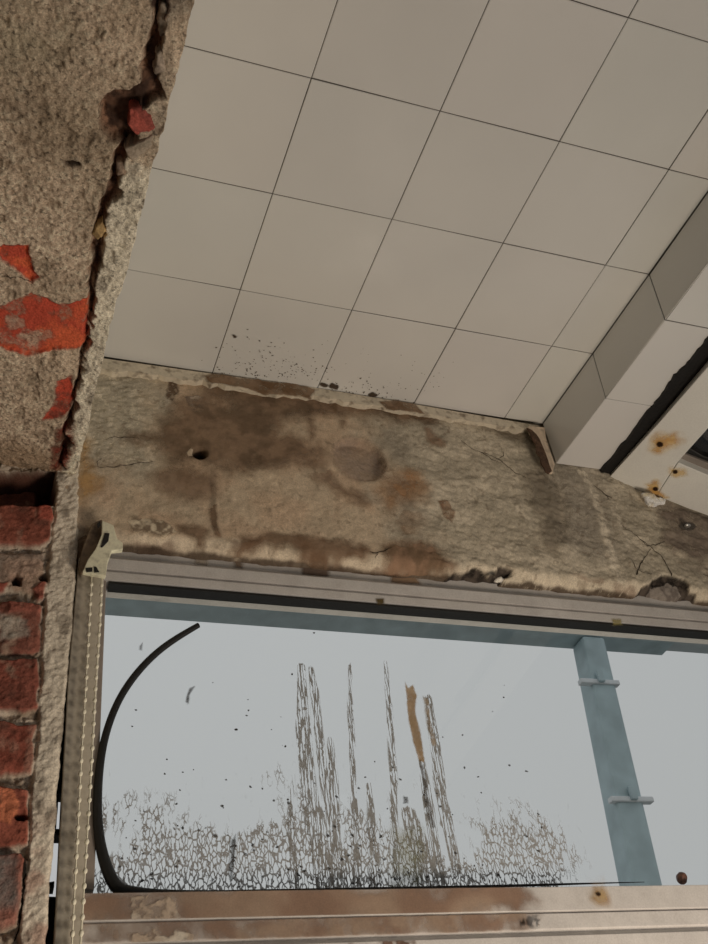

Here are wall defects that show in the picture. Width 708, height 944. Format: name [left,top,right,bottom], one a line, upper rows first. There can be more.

crack [89,0,170,320]
spalling [0,245,39,281]
spalling [0,293,89,356]
spalling [43,376,76,470]
leakage [129,329,443,500]
corrosion [654,436,676,452]
leakage [179,504,221,547]
leakage [234,533,368,577]
crack [631,531,672,576]
spalling [635,576,695,604]
leakage [287,663,382,889]
leakage [384,661,462,886]